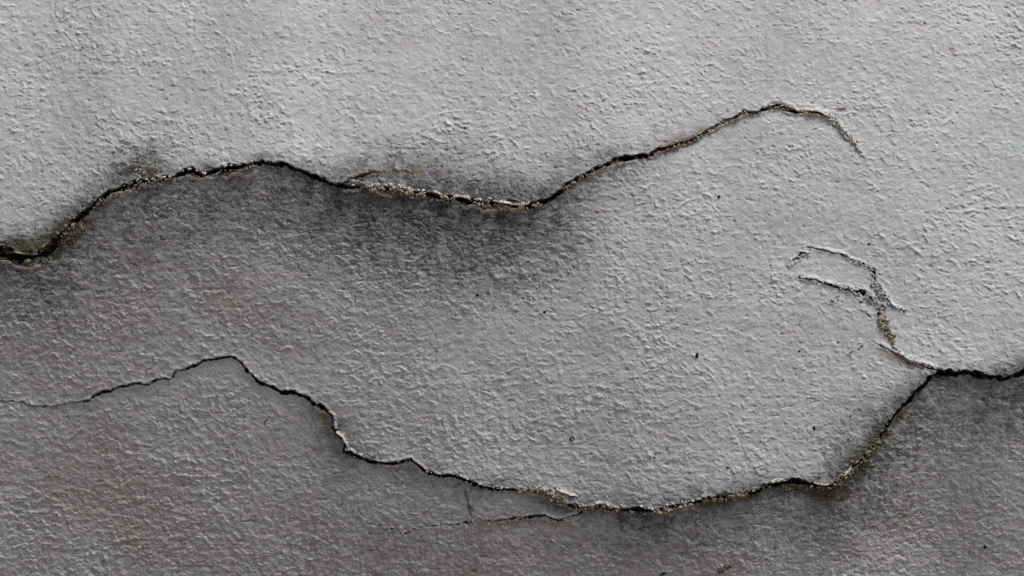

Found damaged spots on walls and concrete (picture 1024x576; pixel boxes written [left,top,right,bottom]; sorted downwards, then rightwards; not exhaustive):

crack [0,101,866,270]
crack [78,243,1024,535]